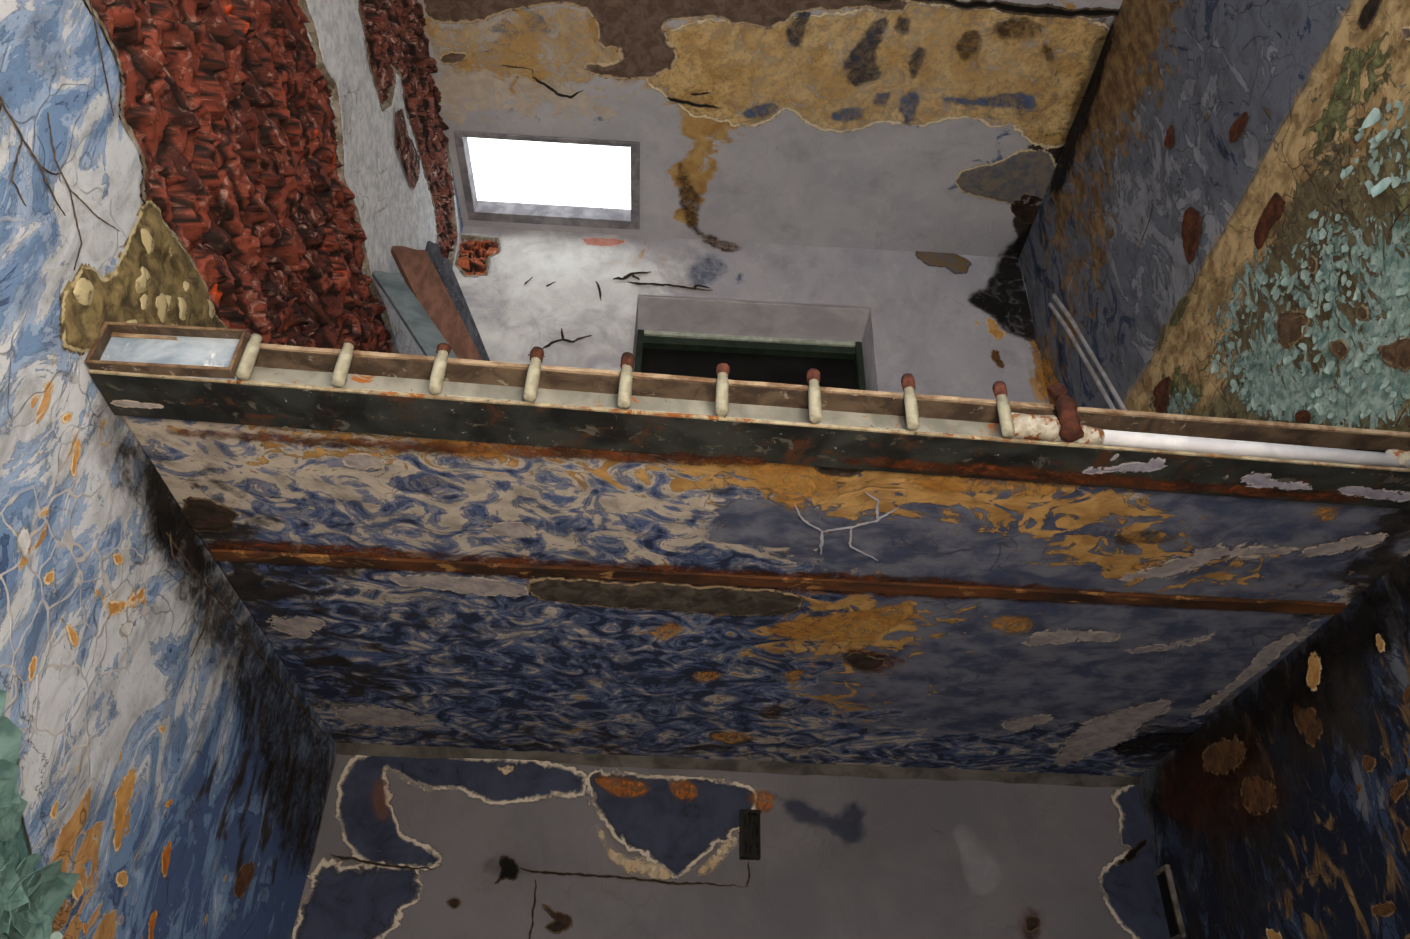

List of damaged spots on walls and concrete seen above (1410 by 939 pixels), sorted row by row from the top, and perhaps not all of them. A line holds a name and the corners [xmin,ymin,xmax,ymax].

crack [865,0,1120,19]
crack [0,96,119,270]
flaking render [59,0,399,356]
flaking render [358,0,923,278]
peeling [1340,101,1410,198]
crack [595,272,713,300]
peeling [1205,209,1410,424]
corrosion [205,541,1154,606]
crack [794,491,899,561]
peeling [1118,532,1389,582]
leakage [115,422,758,939]
crack [520,861,751,939]